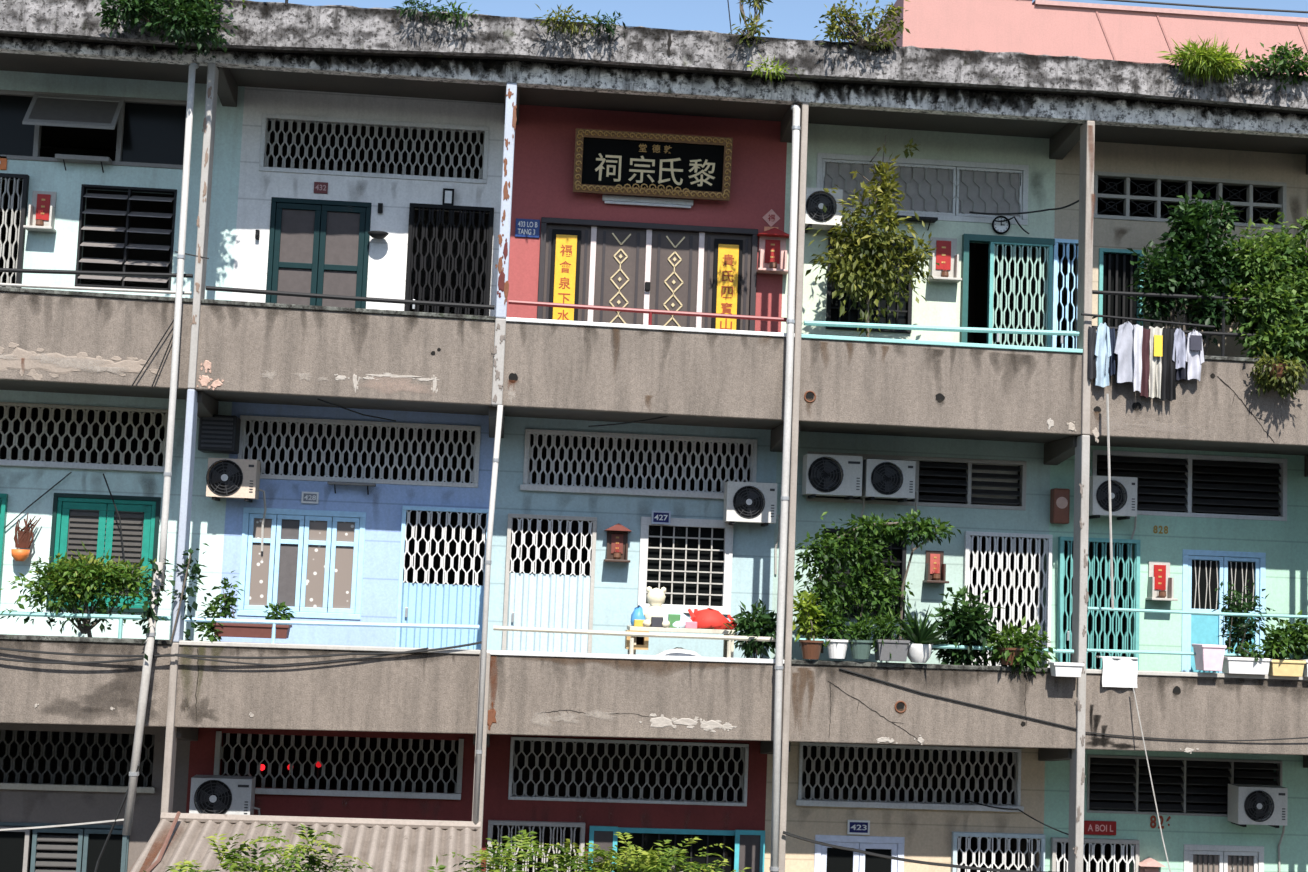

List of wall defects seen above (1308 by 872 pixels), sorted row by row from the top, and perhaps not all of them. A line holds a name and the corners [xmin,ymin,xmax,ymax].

spalling [0,342,161,381]
spalling [197,360,224,391]
peeling [334,373,440,394]
spalling [639,714,737,733]